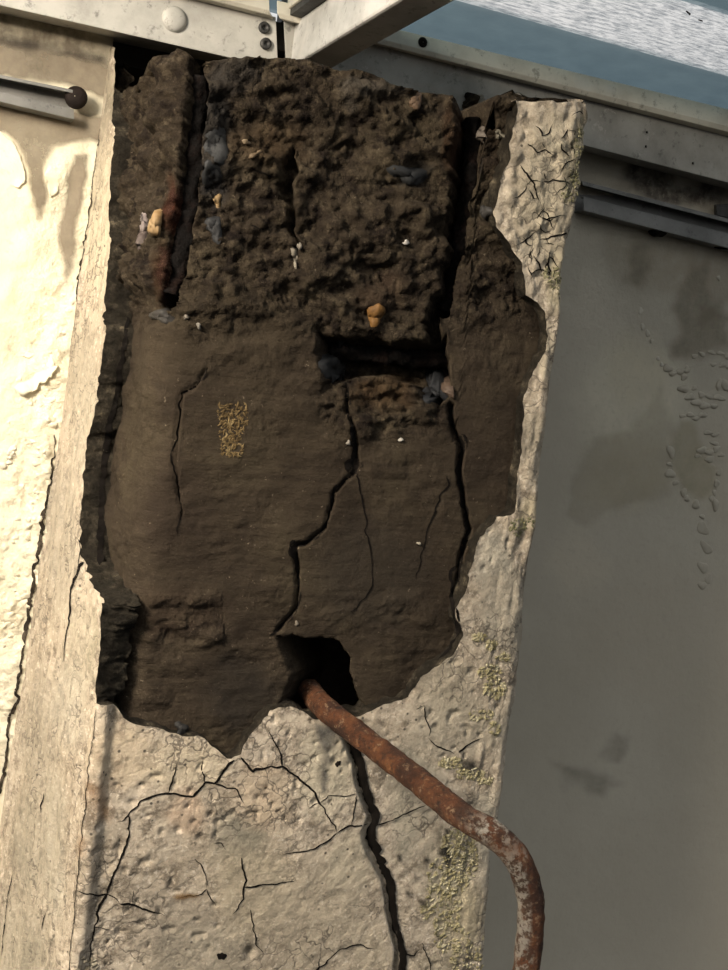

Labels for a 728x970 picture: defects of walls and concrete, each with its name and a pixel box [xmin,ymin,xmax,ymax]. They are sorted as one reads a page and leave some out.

leakage [0,44,108,97]
leakage [0,106,101,216]
leakage [59,155,87,269]
crack [513,111,583,279]
crack [0,435,56,794]
crack [170,368,206,535]
crack [269,382,373,636]
spalling [79,48,568,759]
crack [416,405,471,659]
crack [416,705,482,753]
crack [1,877,12,956]
crack [69,711,432,970]